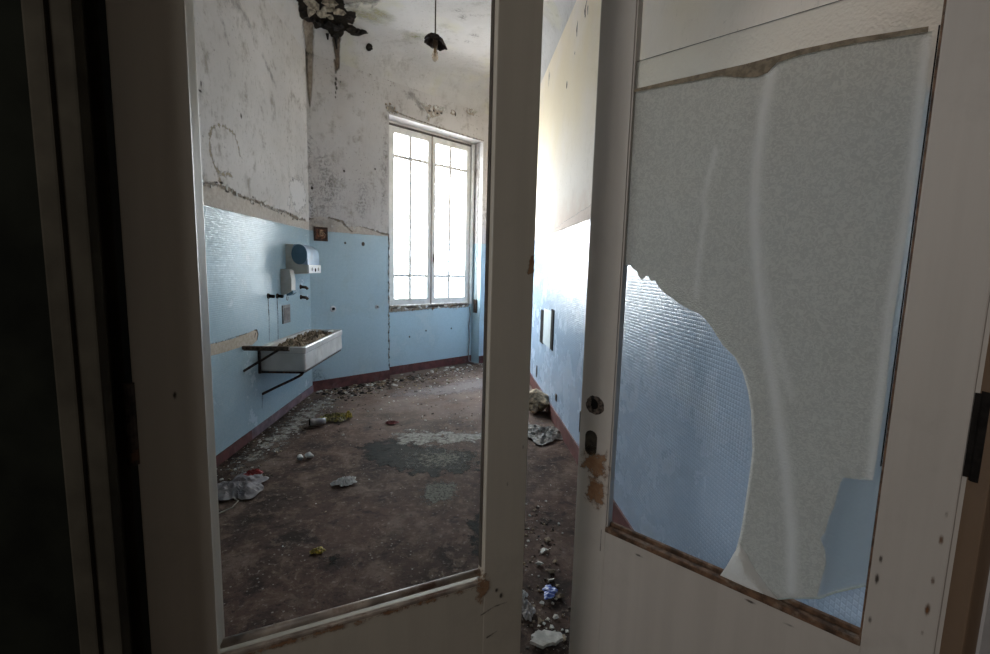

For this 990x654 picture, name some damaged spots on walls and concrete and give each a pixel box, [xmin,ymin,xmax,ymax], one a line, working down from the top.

peeling [303,0,378,20]
damp [332,37,341,98]
peeling [580,451,611,509]